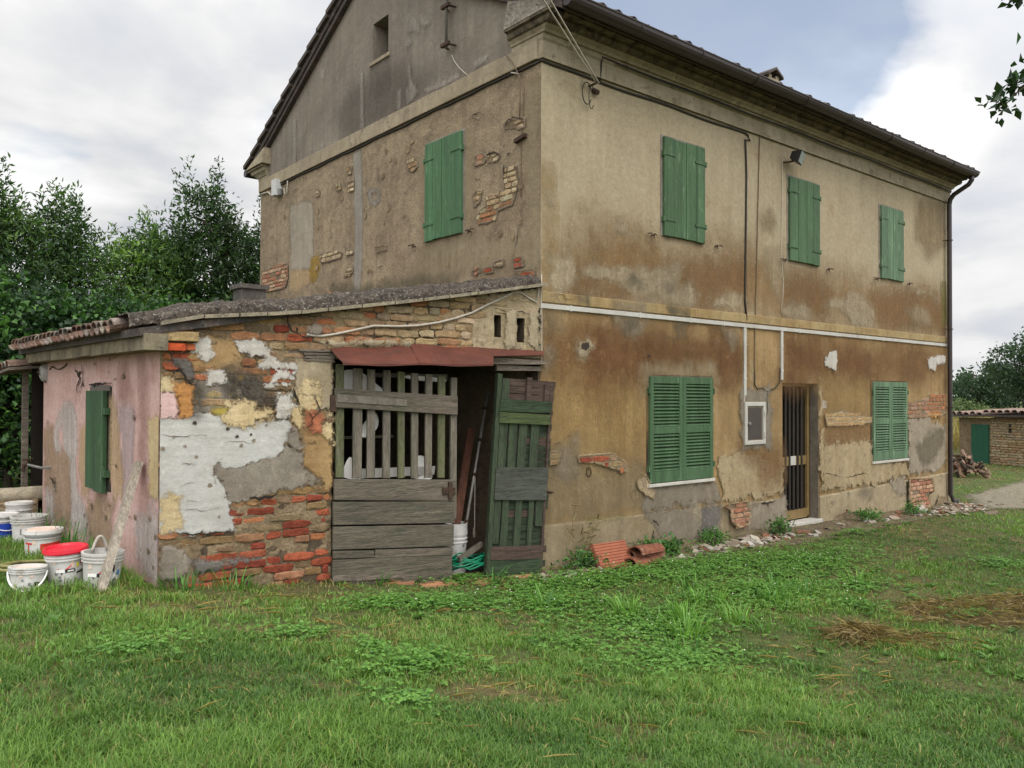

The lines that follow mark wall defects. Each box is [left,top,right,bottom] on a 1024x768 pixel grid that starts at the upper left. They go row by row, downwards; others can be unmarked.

flaking render [472,151,518,237]
flaking render [261,263,288,292]
damp [575,228,944,335]
spalling [578,339,594,357]
peeling [129,412,293,570]
flaking render [578,452,628,473]
peeling [717,447,785,529]
peeling [818,350,947,508]